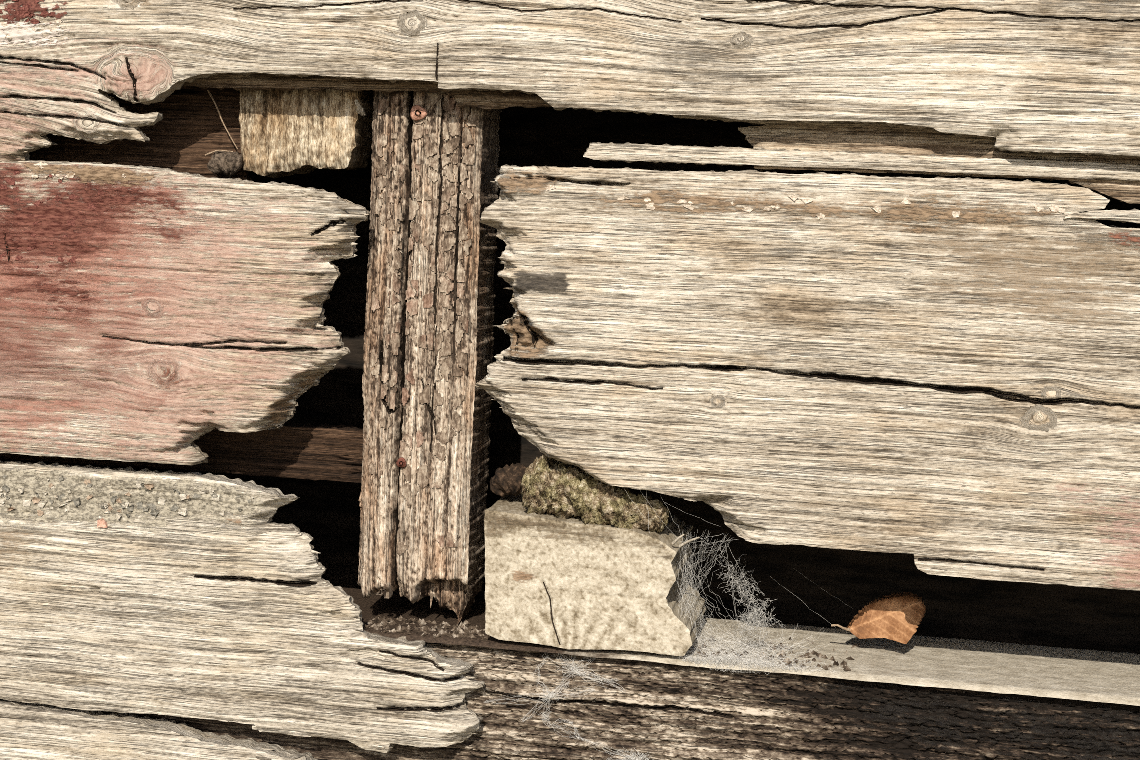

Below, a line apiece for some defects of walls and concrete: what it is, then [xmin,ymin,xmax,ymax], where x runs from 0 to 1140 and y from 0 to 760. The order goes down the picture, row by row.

peeling [0,0,69,46]
crack [233,0,411,9]
crack [460,0,1140,28]
crack [0,56,138,127]
peeling [0,162,193,317]
crack [103,336,341,351]
crack [501,308,1140,409]
crack [194,575,316,587]